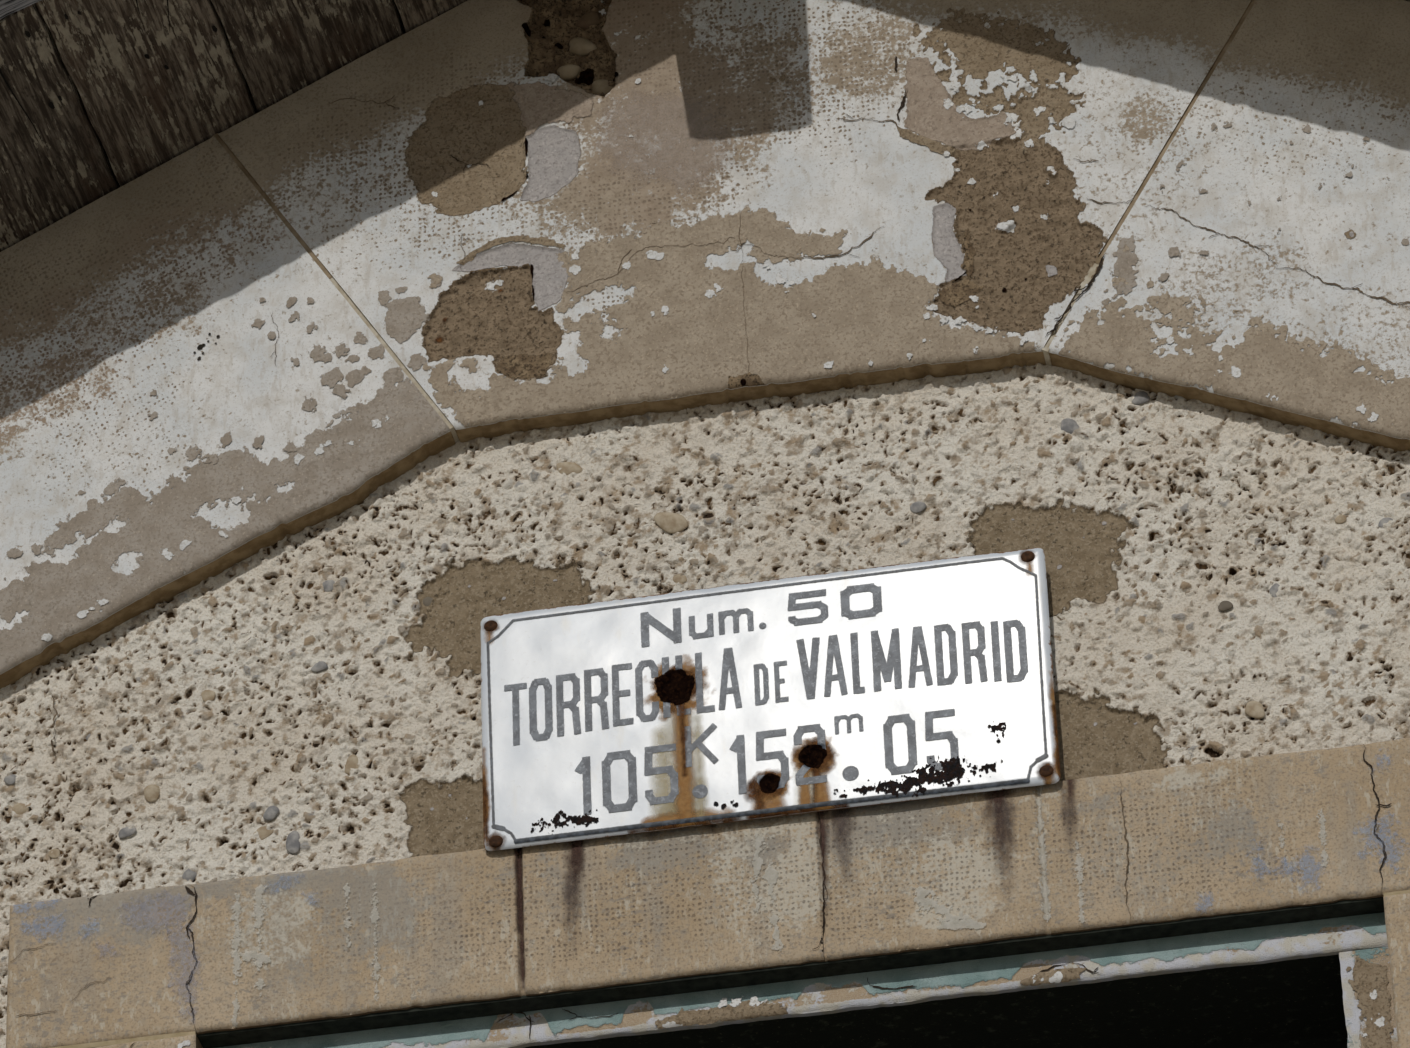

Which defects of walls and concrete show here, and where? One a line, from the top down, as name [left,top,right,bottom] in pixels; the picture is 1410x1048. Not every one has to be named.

crack [1089,198,1410,308]
peeling [0,0,1410,678]
rust [630,661,849,833]
spalling [1055,687,1170,781]
spalling [398,775,485,858]
crack [1363,744,1392,889]
crack [185,885,197,1034]
peeling [655,996,788,1029]
peeling [1020,967,1086,986]